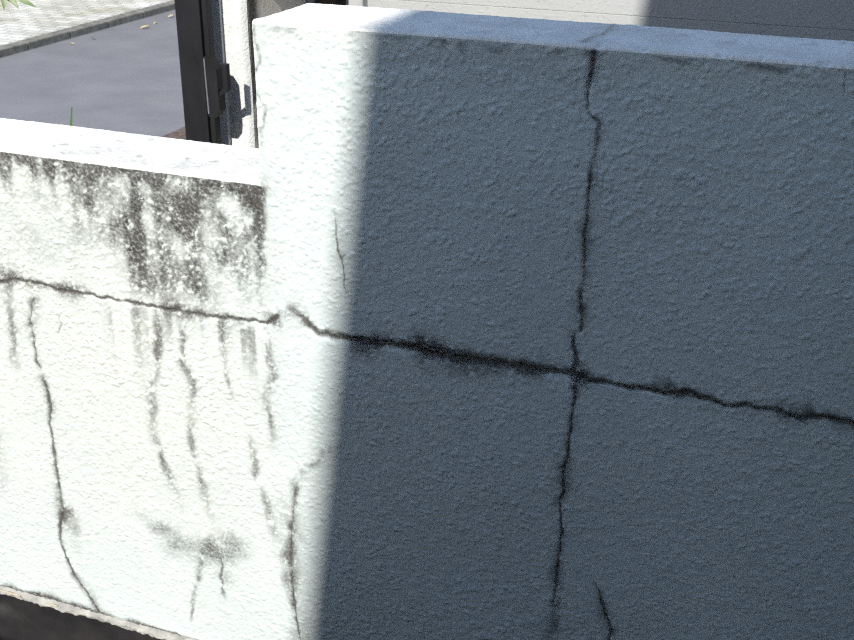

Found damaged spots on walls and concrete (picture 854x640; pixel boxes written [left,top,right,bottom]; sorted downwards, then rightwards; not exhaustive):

crack [248,0,258,139]
crack [587,50,599,145]
damp [0,152,264,295]
crack [581,173,592,262]
damp [153,324,161,360]
crack [0,274,854,621]
damp [201,540,228,593]
crack [599,591,612,638]